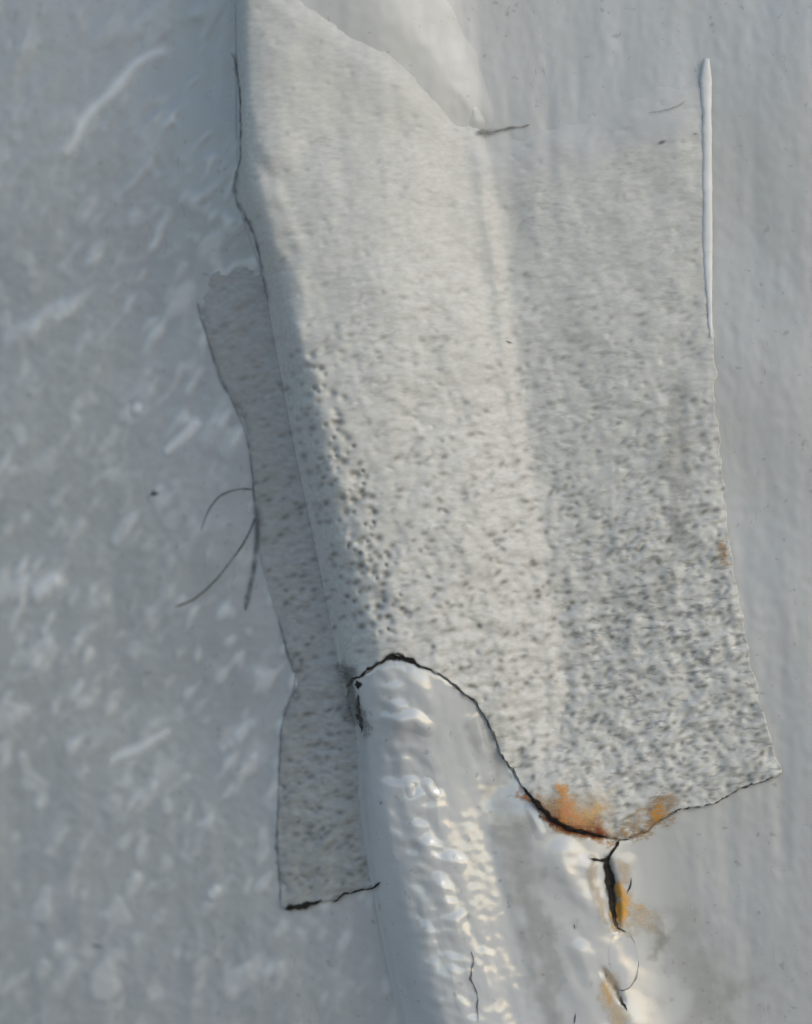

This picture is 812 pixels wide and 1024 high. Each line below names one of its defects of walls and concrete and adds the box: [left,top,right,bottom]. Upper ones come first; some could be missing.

crack [345,653,773,932]
corrosion [517,784,678,846]
corrosion [590,863,651,929]
crack [605,971,627,1010]